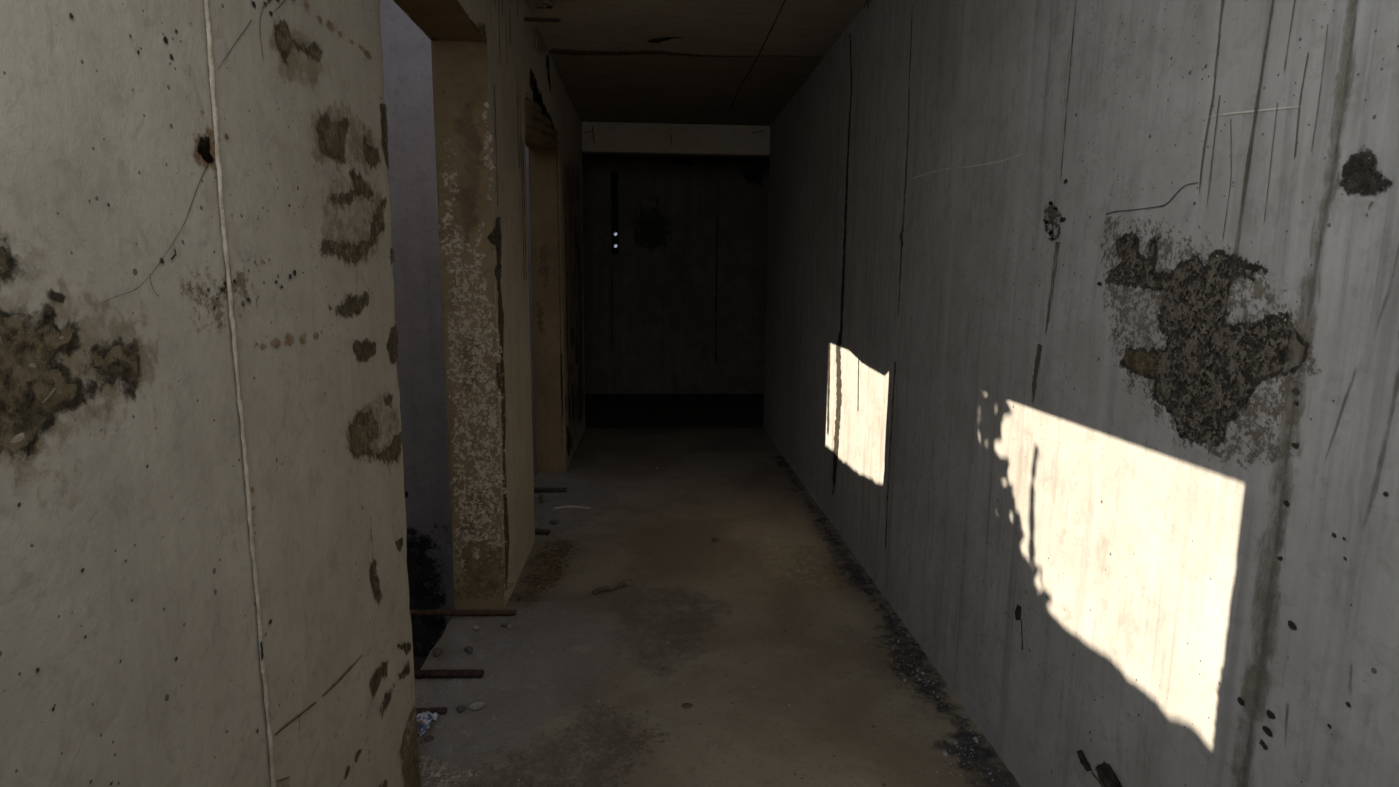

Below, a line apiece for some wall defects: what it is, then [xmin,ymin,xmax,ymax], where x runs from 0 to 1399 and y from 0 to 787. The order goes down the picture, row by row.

spalling [271,19,323,81]
spalling [312,103,395,264]
spalling [1338,148,1393,216]
spalling [0,237,25,281]
spalling [0,289,151,468]
spalling [1097,216,1320,471]
spalling [347,394,402,464]